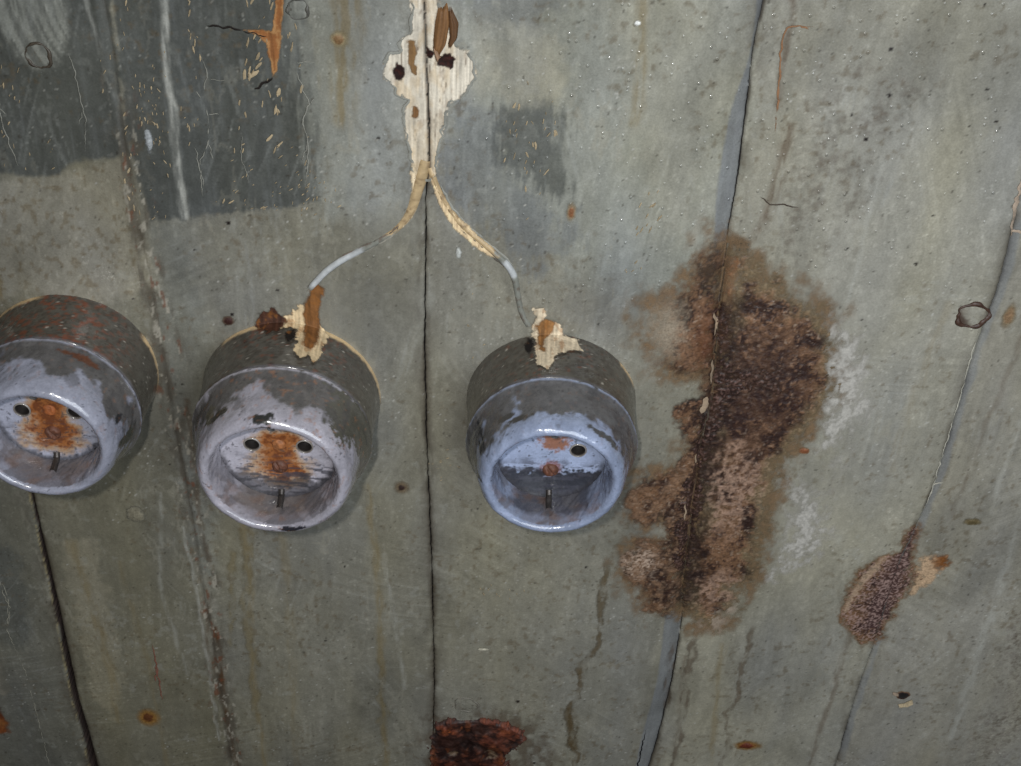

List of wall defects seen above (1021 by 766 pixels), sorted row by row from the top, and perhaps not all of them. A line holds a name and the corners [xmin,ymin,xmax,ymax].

peeling [383,0,477,182]